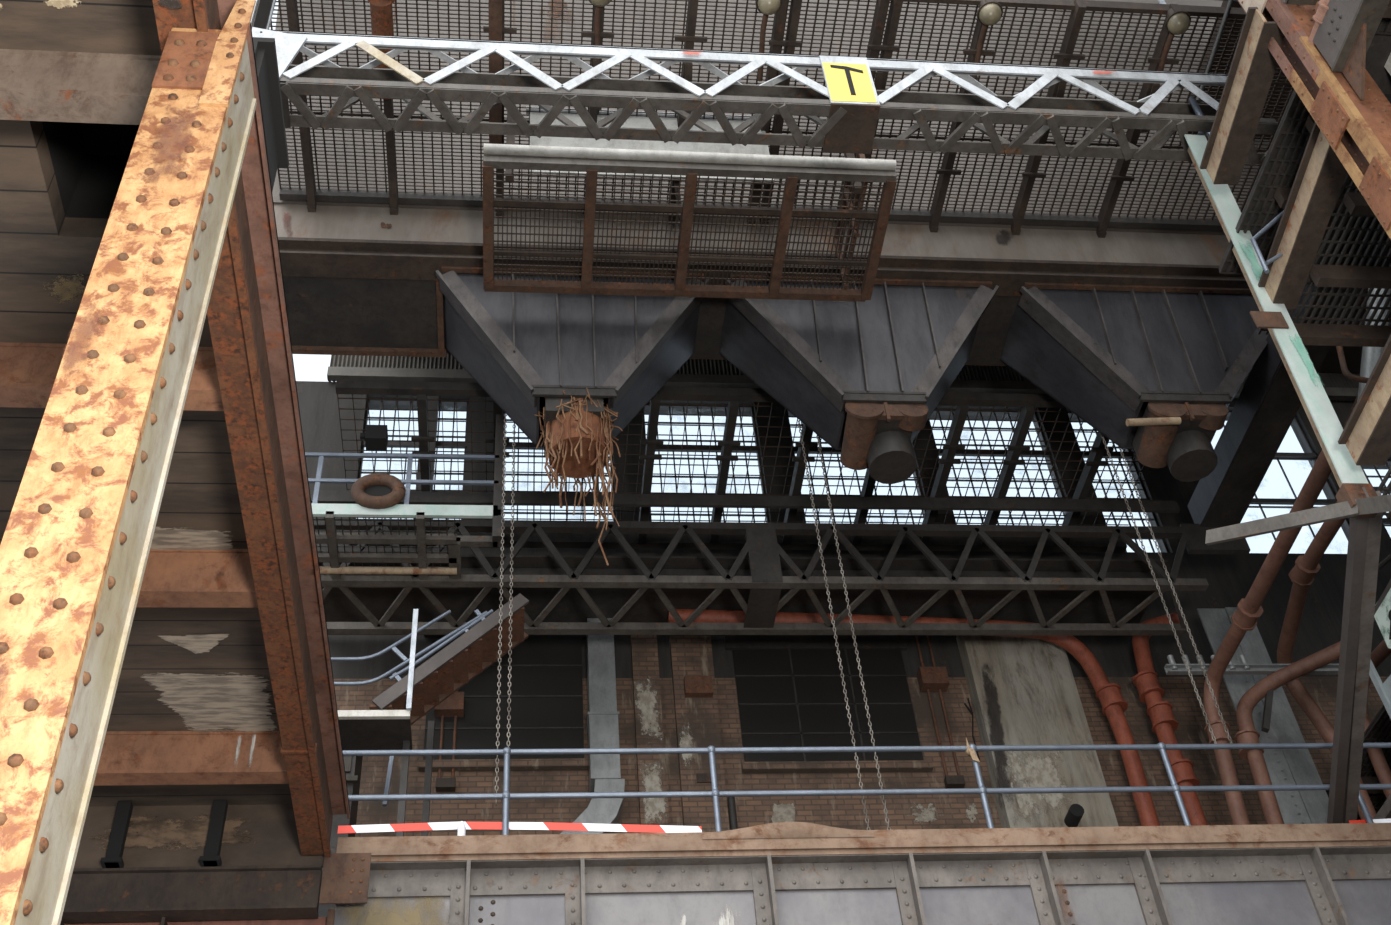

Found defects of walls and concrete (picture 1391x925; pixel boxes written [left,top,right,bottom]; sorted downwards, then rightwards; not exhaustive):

peeling [45,0,80,9]
corrosion [148,111,195,180]
corrosion [64,304,99,368]
spalling [159,634,230,654]
spalling [141,672,277,732]
leakage [982,665,1010,796]